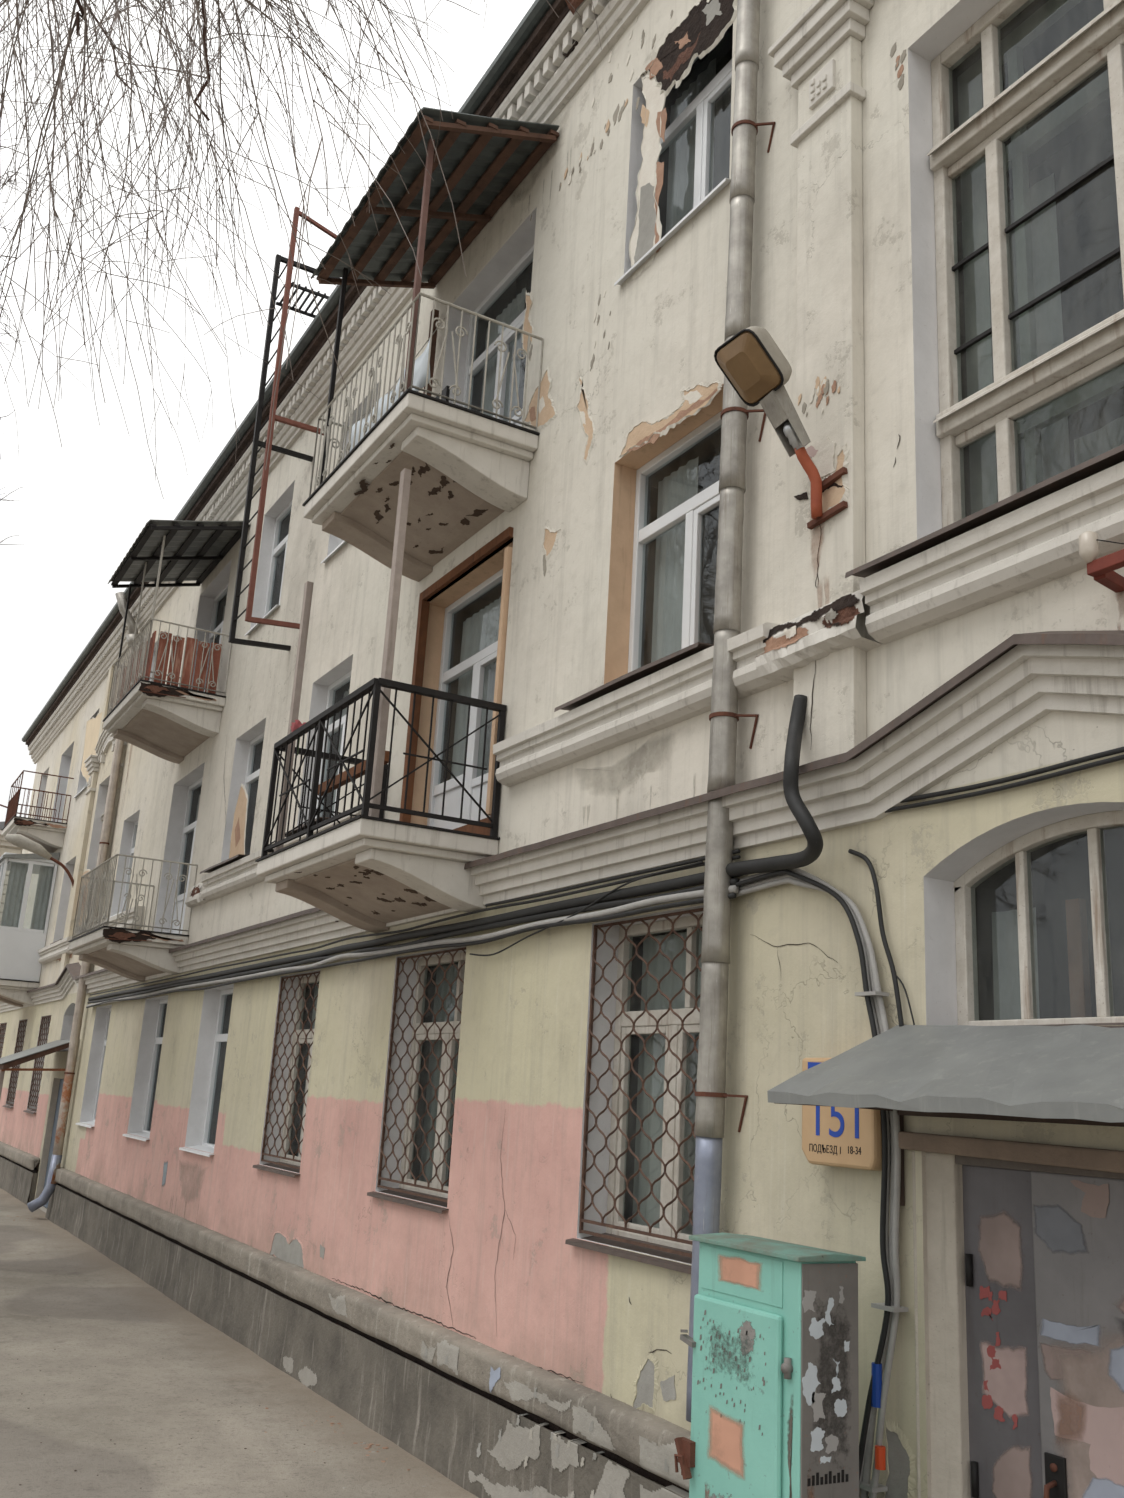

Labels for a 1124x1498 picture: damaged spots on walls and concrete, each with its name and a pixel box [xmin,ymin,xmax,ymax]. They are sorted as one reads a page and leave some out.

peeling [522,290,534,360]
peeling [524,366,557,431]
peeling [576,290,611,465]
spalling [618,380,723,457]
spalling [763,594,860,643]
spalling [283,1356,317,1387]
spalling [468,1375,691,1498]